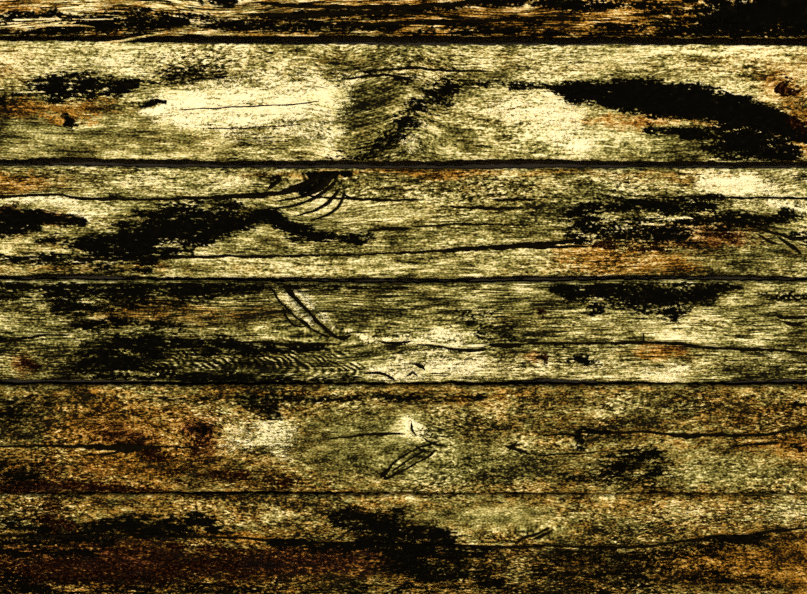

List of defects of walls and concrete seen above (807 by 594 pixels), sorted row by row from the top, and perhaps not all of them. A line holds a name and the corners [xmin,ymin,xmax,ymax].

leakage [0,0,807,37]
leakage [320,66,807,161]
leakage [559,191,807,252]
leakage [0,171,407,383]
leakage [546,282,744,323]
leakage [756,289,807,302]
leakage [159,395,209,403]
leakage [233,391,487,423]
crack [504,425,807,456]
crack [0,527,807,565]